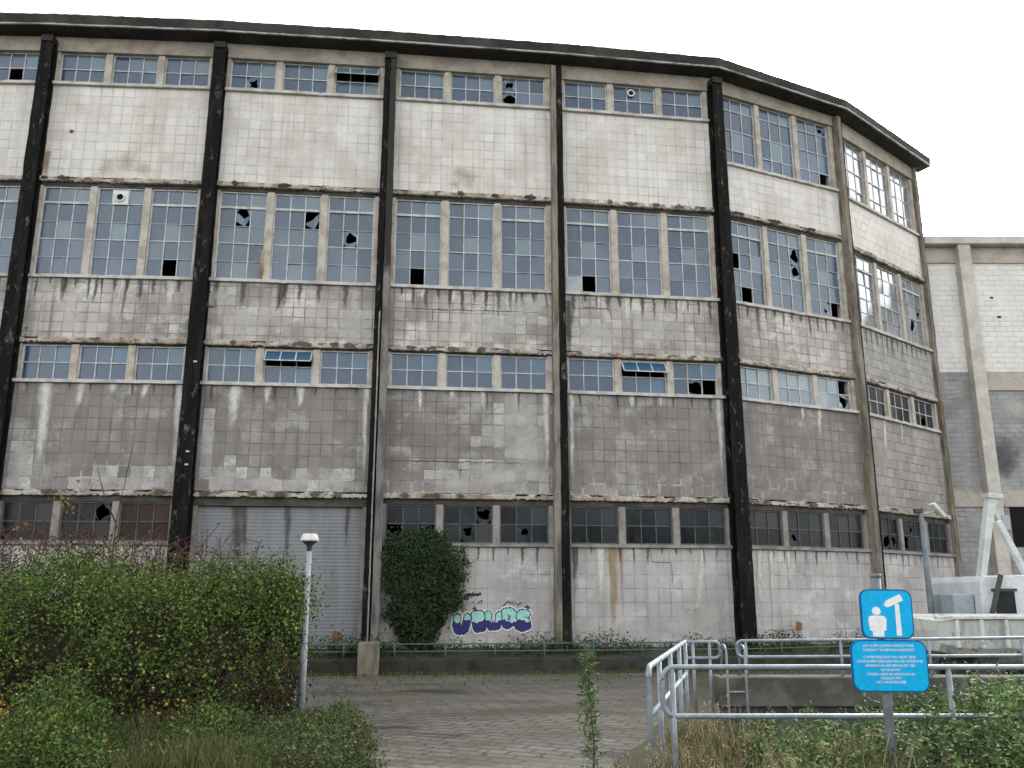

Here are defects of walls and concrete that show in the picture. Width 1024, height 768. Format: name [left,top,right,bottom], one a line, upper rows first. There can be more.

spalling [597,199,705,210]
damp [34,277,180,310]
damp [278,284,302,303]
damp [401,288,547,308]
damp [26,382,52,459]
damp [69,383,91,403]
damp [173,385,183,462]
damp [229,386,276,421]
damp [294,387,317,404]
damp [355,389,369,465]
damp [233,507,247,554]
rust [609,548,623,608]